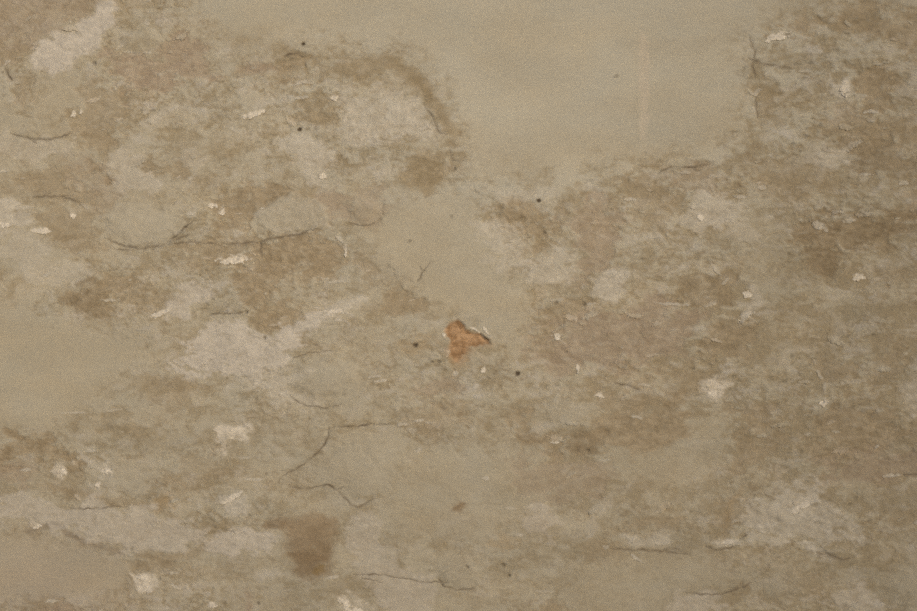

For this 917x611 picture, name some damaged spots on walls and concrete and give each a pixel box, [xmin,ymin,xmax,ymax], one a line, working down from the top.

peeling [0,0,94,113]
peeling [0,61,140,261]
peeling [285,80,345,134]
peeling [760,0,917,282]
peeling [0,424,95,503]
peeling [125,367,219,420]
peeling [167,172,362,339]
crack [278,396,403,509]
peeling [372,283,434,319]
peeling [390,387,479,453]
flaking render [429,317,498,371]
peeling [486,147,762,420]